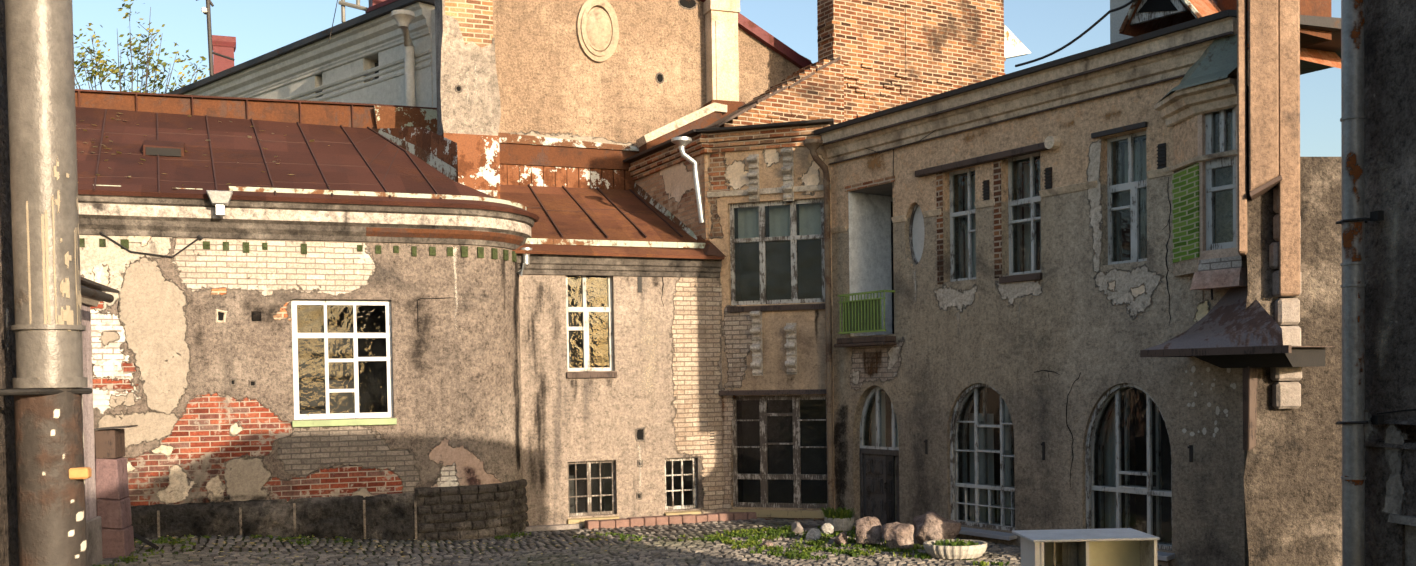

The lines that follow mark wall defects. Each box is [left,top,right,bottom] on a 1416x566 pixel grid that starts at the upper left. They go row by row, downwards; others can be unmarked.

rust [1351,0,1364,49]
flaking render [79,235,376,322]
water stain [502,260,543,353]
flaking render [659,152,749,239]
peeling [995,273,1042,307]
peeling [1086,138,1164,320]
rust [1342,221,1362,262]
rust [1346,152,1363,202]
flaking render [82,361,139,409]
flaking render [126,392,502,506]
water stain [514,364,546,487]
flaking render [850,336,905,391]